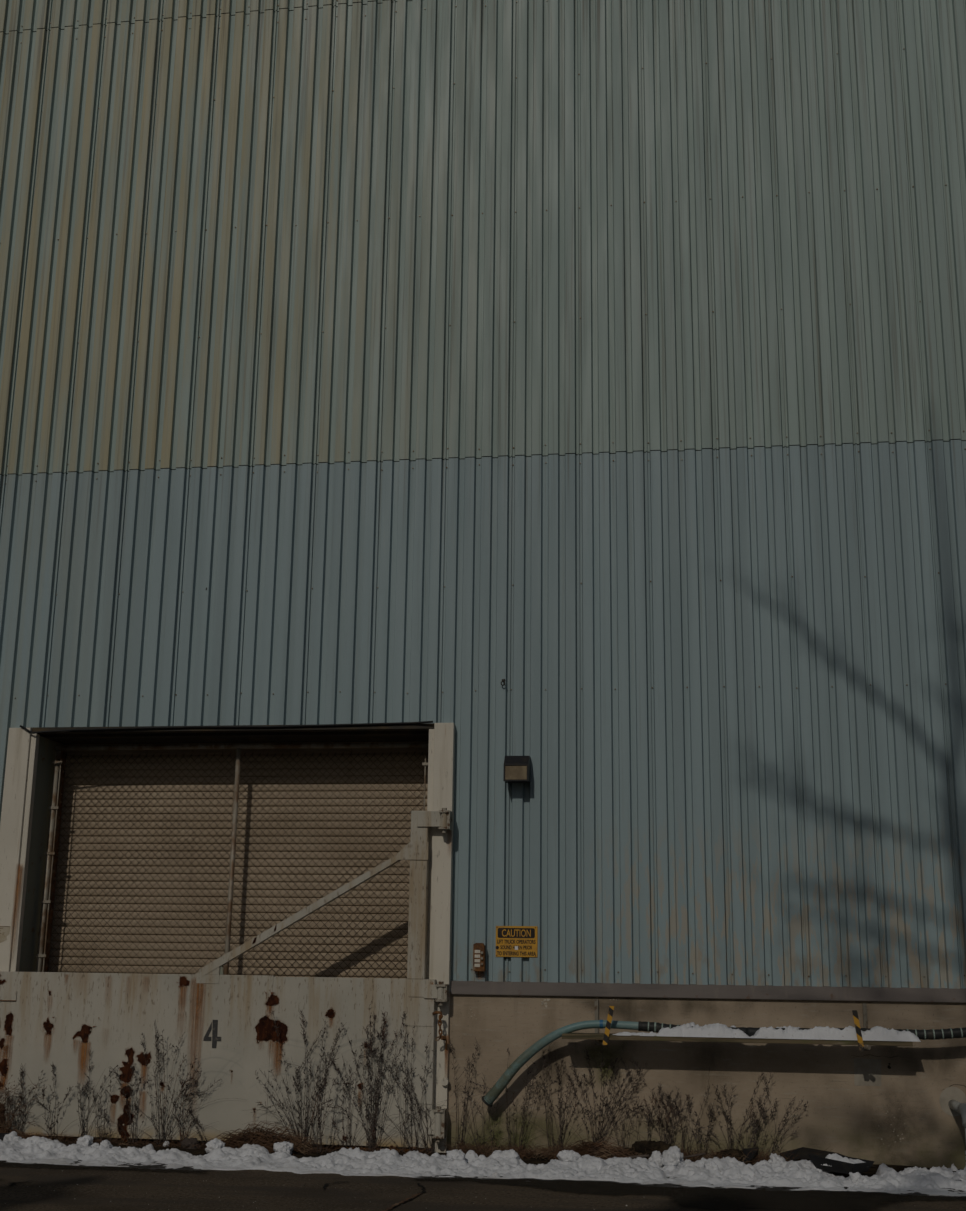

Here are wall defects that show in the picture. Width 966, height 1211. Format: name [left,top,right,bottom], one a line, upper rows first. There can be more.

corrosion [0,1013,13,1088]
corrosion [43,1017,54,1048]
corrosion [73,1017,99,1072]
corrosion [177,976,202,1050]
corrosion [255,989,288,1064]
corrosion [110,1048,151,1141]